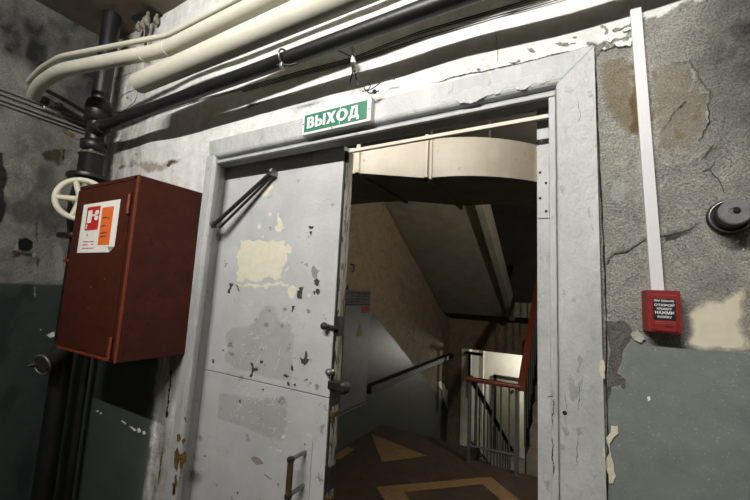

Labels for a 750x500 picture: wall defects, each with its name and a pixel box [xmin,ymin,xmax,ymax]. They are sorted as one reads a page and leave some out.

peeling [586,24,632,56]
water stain [630,79,638,132]
crack [678,60,732,192]
peeling [599,320,645,400]
corrosion [172,434,187,496]
peeling [602,426,619,483]